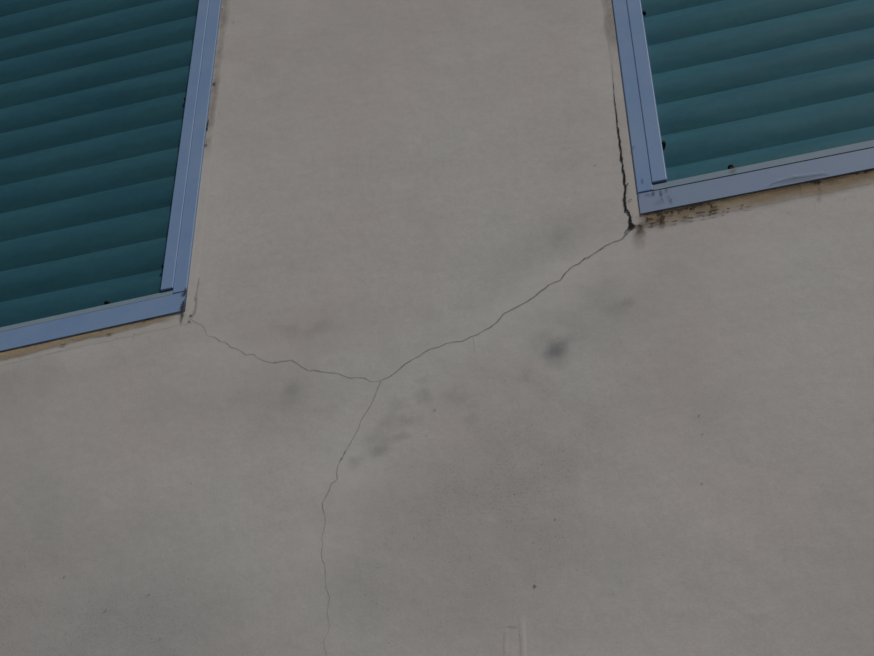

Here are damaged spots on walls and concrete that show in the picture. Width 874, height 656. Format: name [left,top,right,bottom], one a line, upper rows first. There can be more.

crack [597,72,640,252]